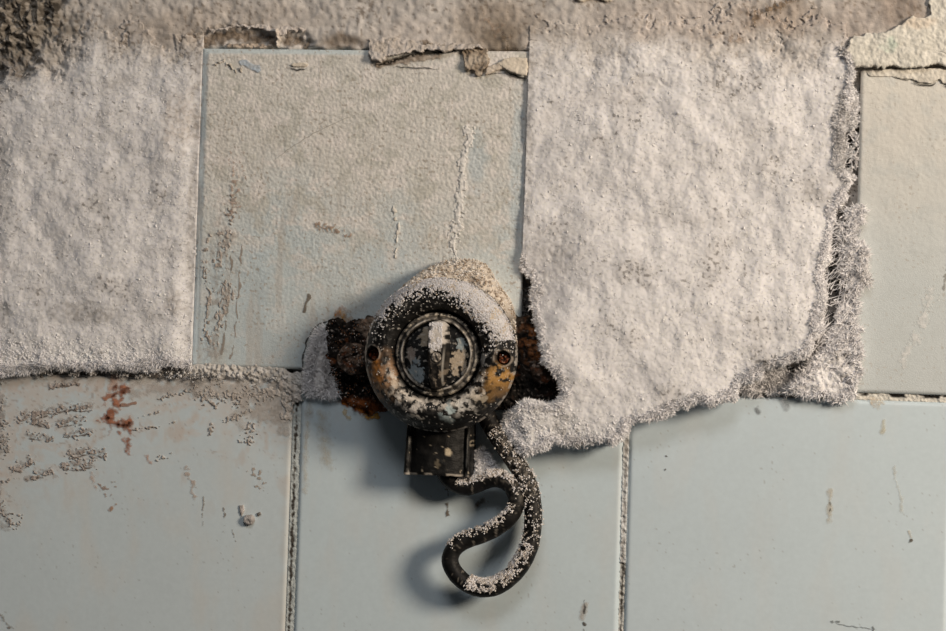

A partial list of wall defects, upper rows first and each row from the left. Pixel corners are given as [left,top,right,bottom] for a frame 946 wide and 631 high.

flaking render [181,24,310,73]
peeling [461,47,529,76]
peeling [848,0,946,84]
leakage [522,286,533,317]
leakage [825,230,849,339]
corrosion [327,310,385,419]
corrosion [97,375,137,455]